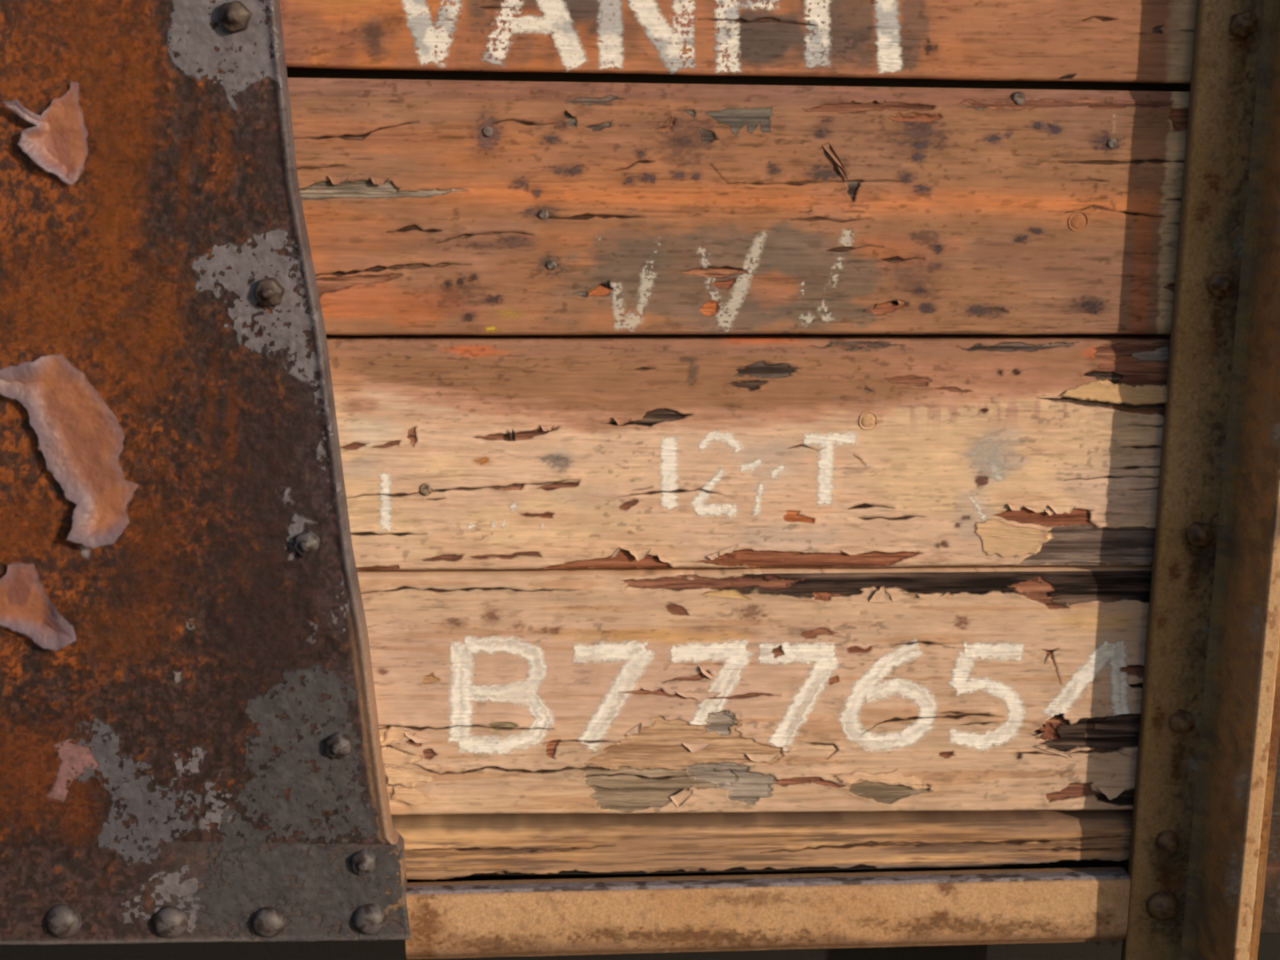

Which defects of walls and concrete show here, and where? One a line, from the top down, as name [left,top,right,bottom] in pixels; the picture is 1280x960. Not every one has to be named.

peeling [167,0,284,111]
peeling [192,229,417,509]
peeling [964,342,1073,352]
peeling [1041,342,1175,416]
peeling [1120,665,1149,688]
corrosion [0,715,97,843]
peeling [47,665,410,942]
peeling [379,726,437,806]
peeling [489,722,518,730]
peeling [546,740,559,759]
peeling [1034,714,1144,759]
peeling [1046,782,1134,806]